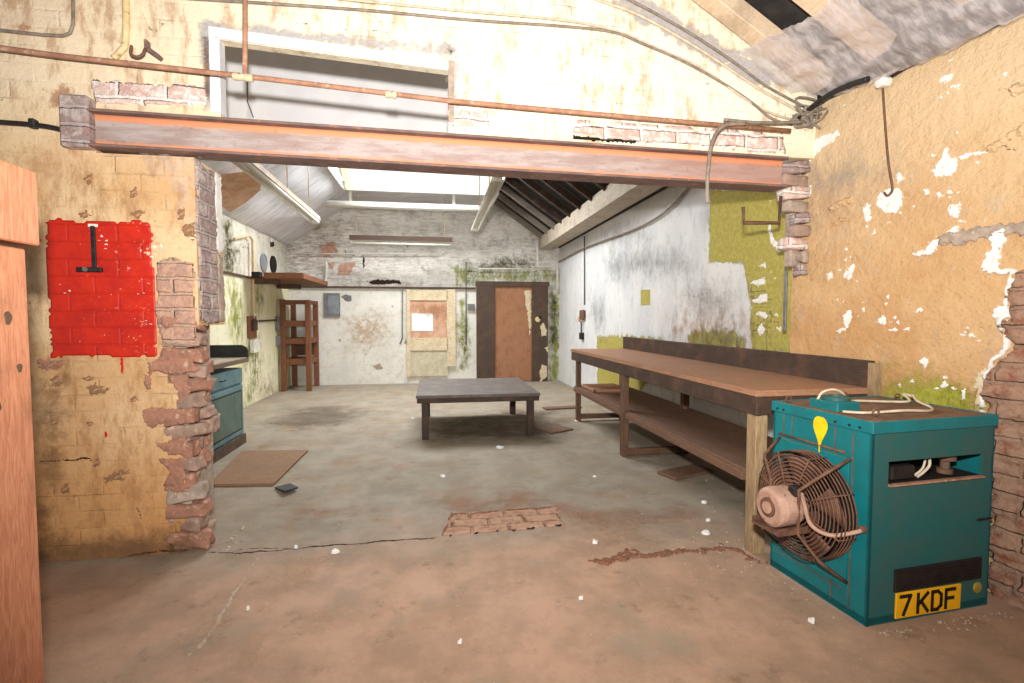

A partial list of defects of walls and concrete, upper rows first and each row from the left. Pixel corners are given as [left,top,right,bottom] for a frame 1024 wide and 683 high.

flaking render [91,79,208,107]
flaking render [573,120,840,277]
peeling [862,172,915,235]
damp [455,259,531,286]
peeling [826,248,858,282]
peeling [524,290,548,352]
peeling [836,299,865,333]
peeling [877,295,909,332]
spalling [82,376,109,396]
spalling [130,159,226,550]
flaking render [912,148,1024,609]
crack [127,537,437,658]